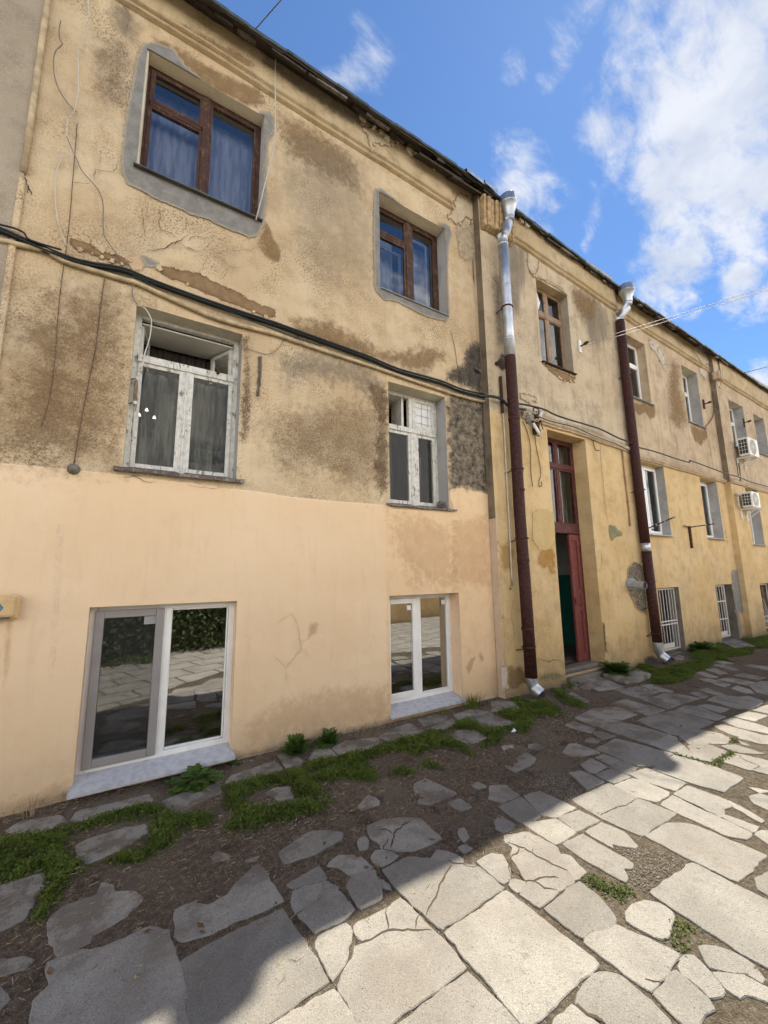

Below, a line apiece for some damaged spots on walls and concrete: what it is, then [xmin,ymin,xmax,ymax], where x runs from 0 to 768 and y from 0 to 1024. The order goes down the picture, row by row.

flaking render [70,238,276,319]
crack [140,209,252,279]
damp [446,343,488,494]
flaking render [609,525,622,541]
flaking render [628,561,647,615]